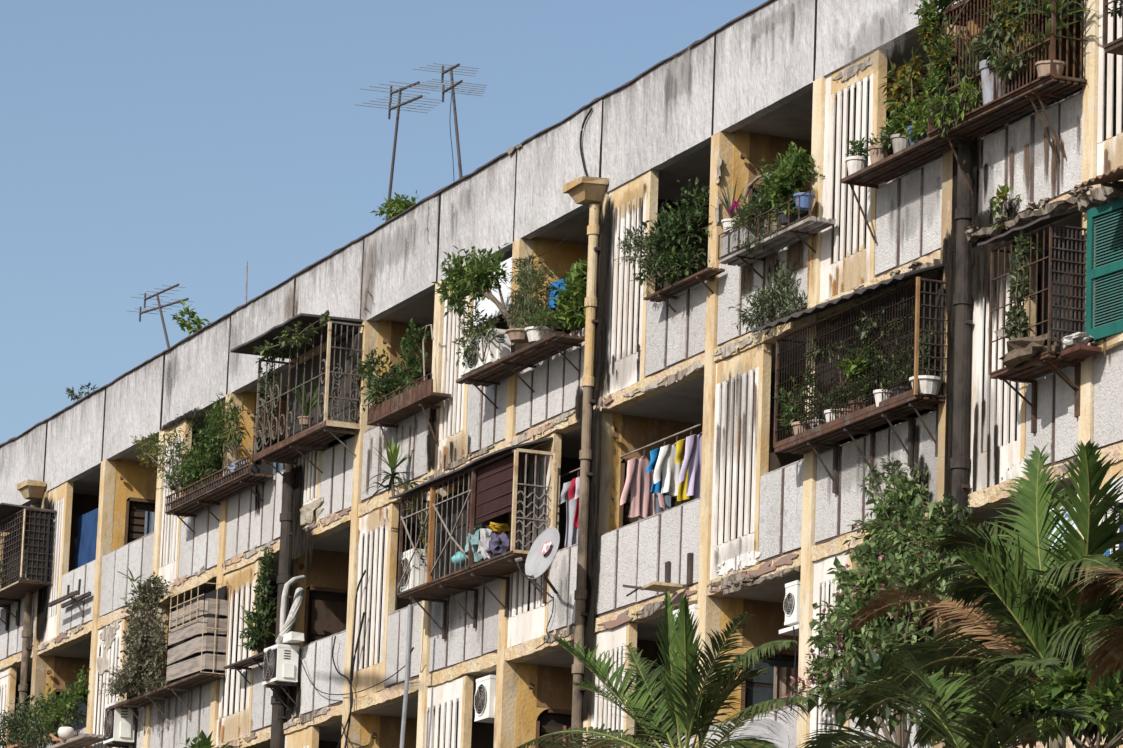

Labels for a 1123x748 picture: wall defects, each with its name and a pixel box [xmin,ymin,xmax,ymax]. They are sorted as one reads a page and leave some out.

spalling [597,551,799,629]